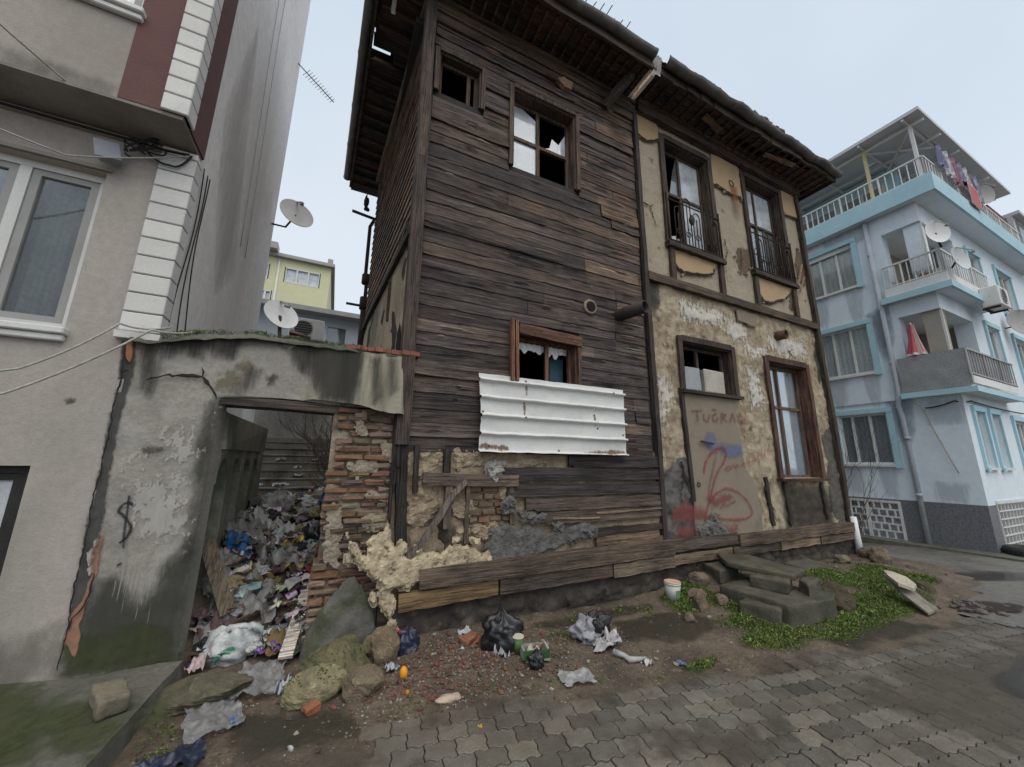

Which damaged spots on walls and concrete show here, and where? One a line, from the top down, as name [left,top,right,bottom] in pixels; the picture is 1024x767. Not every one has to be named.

peeling [63,534,104,657]
water stain [62,501,202,676]
crack [57,341,217,670]
peeling [112,407,220,623]
water stain [143,335,255,485]
water stain [283,341,362,402]
water stain [373,358,395,403]
spalling [428,515,458,548]
spalling [485,460,506,483]
peeling [657,373,676,428]
spalling [664,457,696,539]
peeling [675,247,809,411]